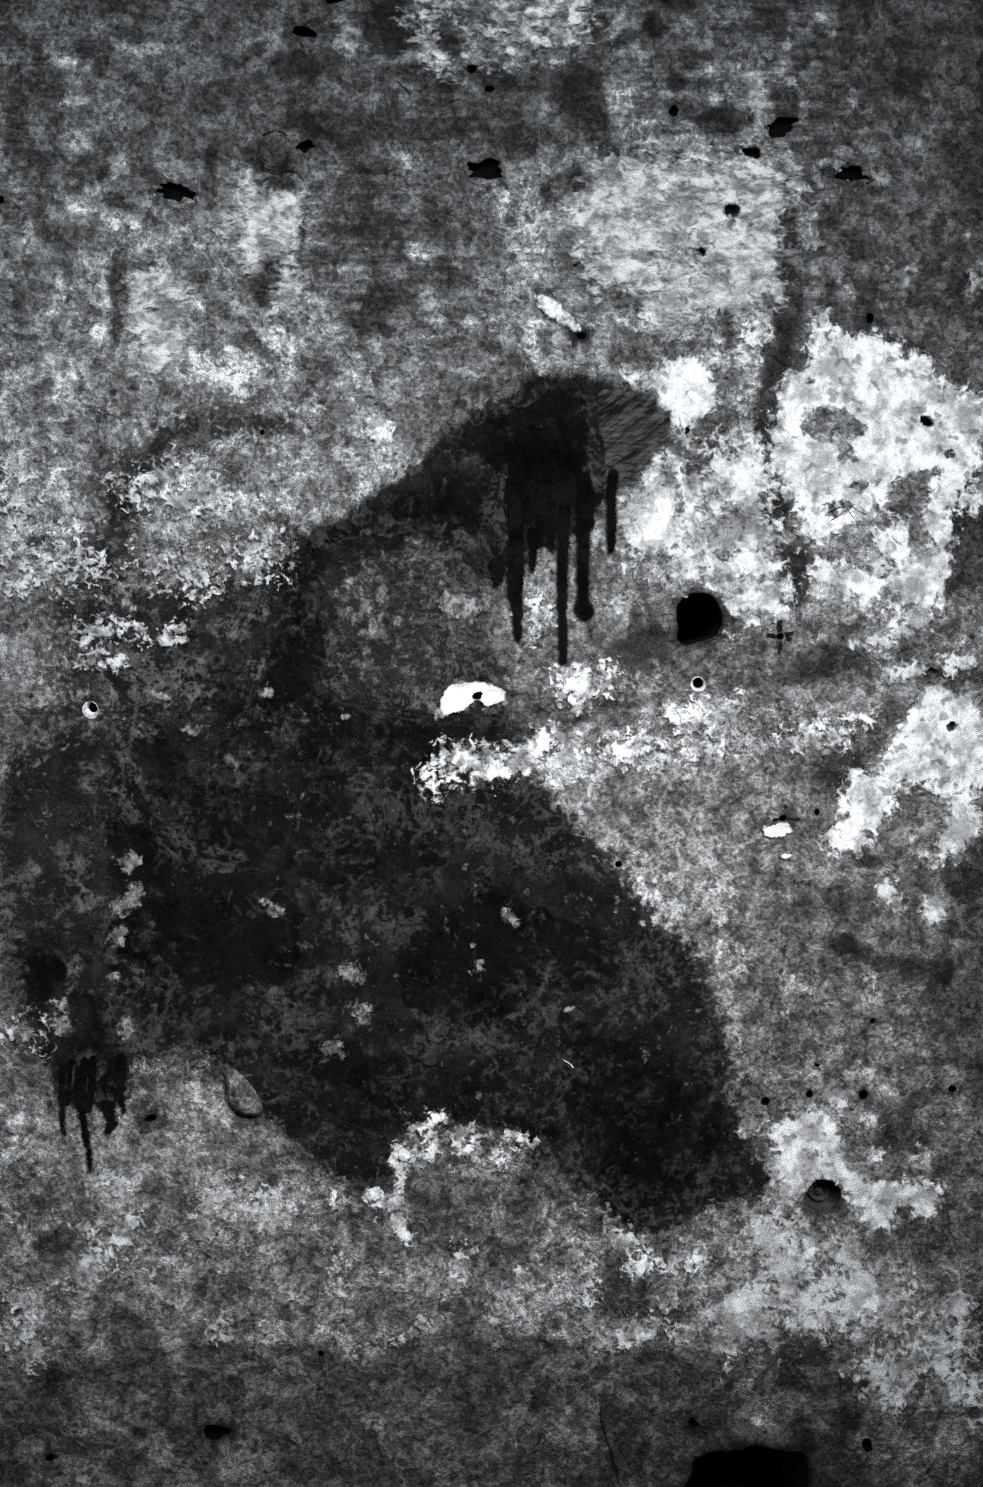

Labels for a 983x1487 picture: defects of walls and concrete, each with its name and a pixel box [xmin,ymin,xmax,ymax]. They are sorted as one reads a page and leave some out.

damp [0,1287,47,1375]
damp [0,368,880,1357]